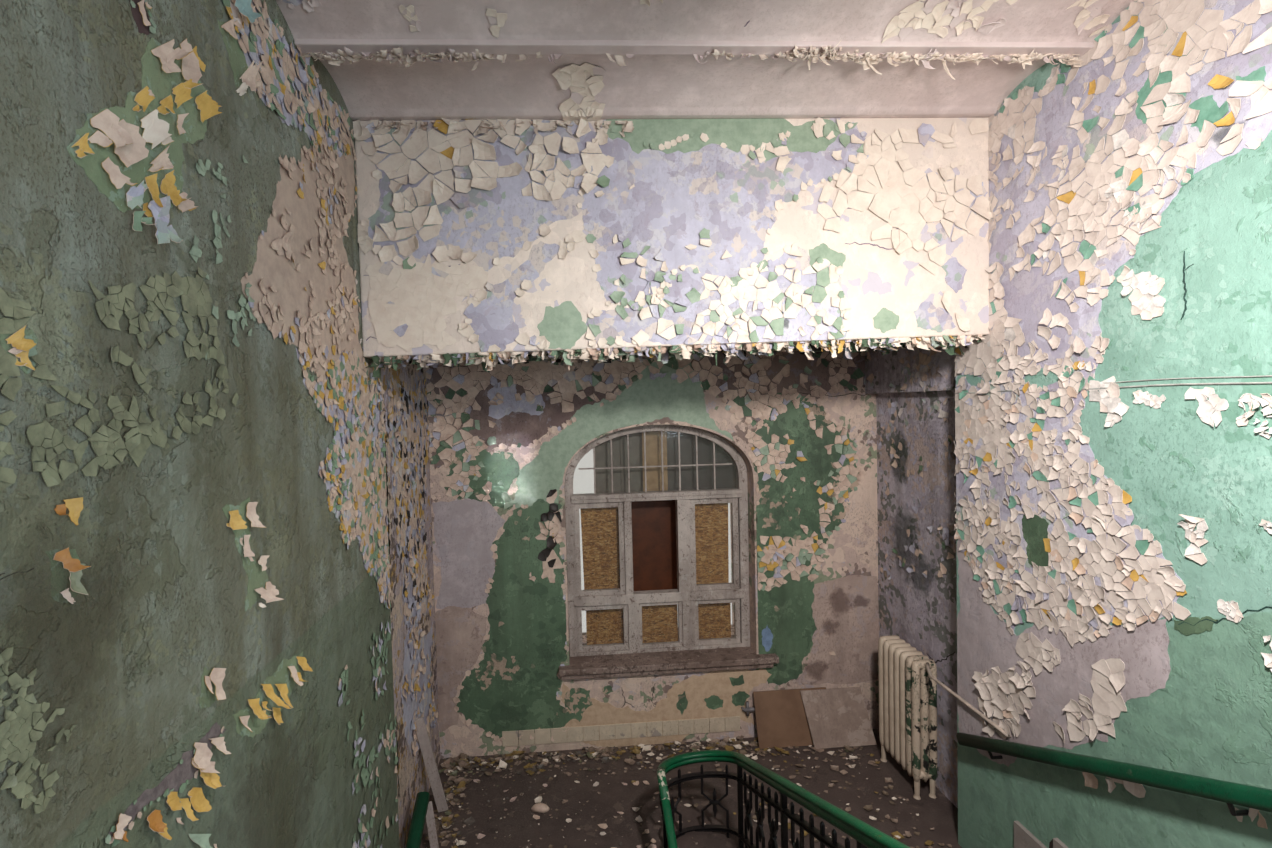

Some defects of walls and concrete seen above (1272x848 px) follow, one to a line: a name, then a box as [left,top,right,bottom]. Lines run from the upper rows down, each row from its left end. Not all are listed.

peeling [67,0,228,244]
peeling [212,210,231,264]
crack [1180,251,1193,320]
peeling [0,235,238,493]
peeling [217,0,1272,757]
peeling [54,497,83,526]
peeling [46,547,91,604]
crack [1178,606,1272,626]
peeling [0,647,76,814]
spalling [105,651,313,848]
peeling [347,709,400,848]
peeling [1082,772,1146,798]